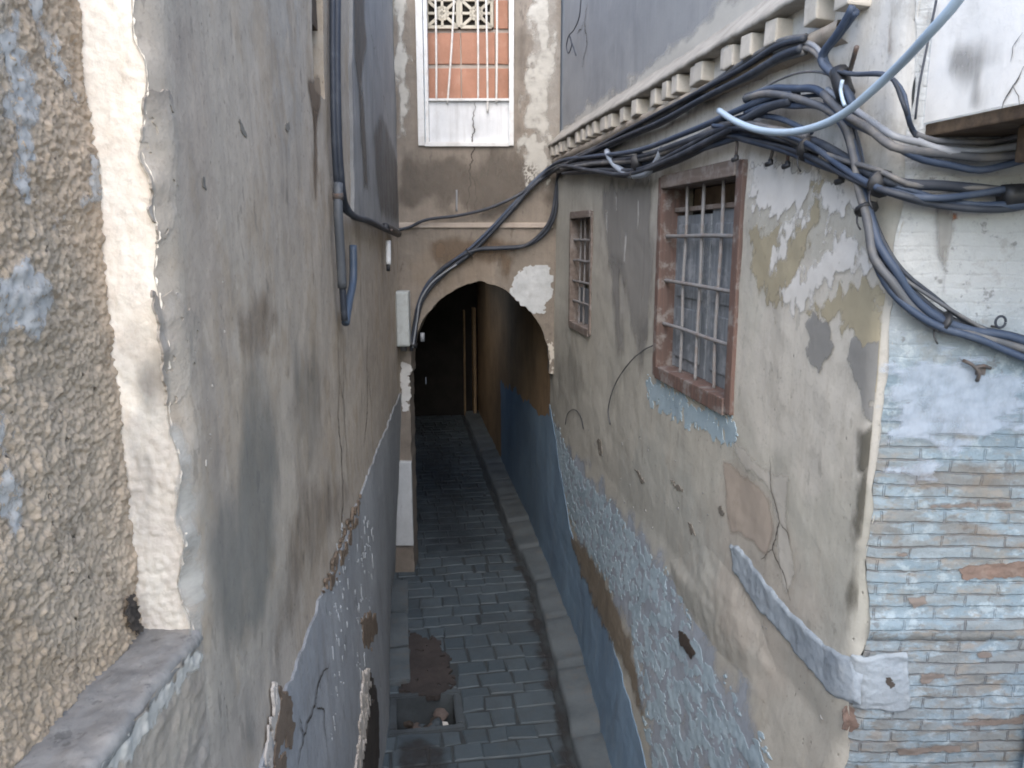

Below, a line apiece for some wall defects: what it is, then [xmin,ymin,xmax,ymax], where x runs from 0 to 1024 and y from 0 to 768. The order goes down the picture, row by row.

spalling [137,89,179,244]
crack [468,103,476,170]
peeling [517,0,557,187]
peeling [510,265,553,314]
peeling [749,156,885,421]
spalling [150,290,200,406]
peeling [646,374,738,447]
crack [762,464,790,598]
peeling [553,414,772,768]
spalling [262,681,296,768]
crack [298,667,329,765]